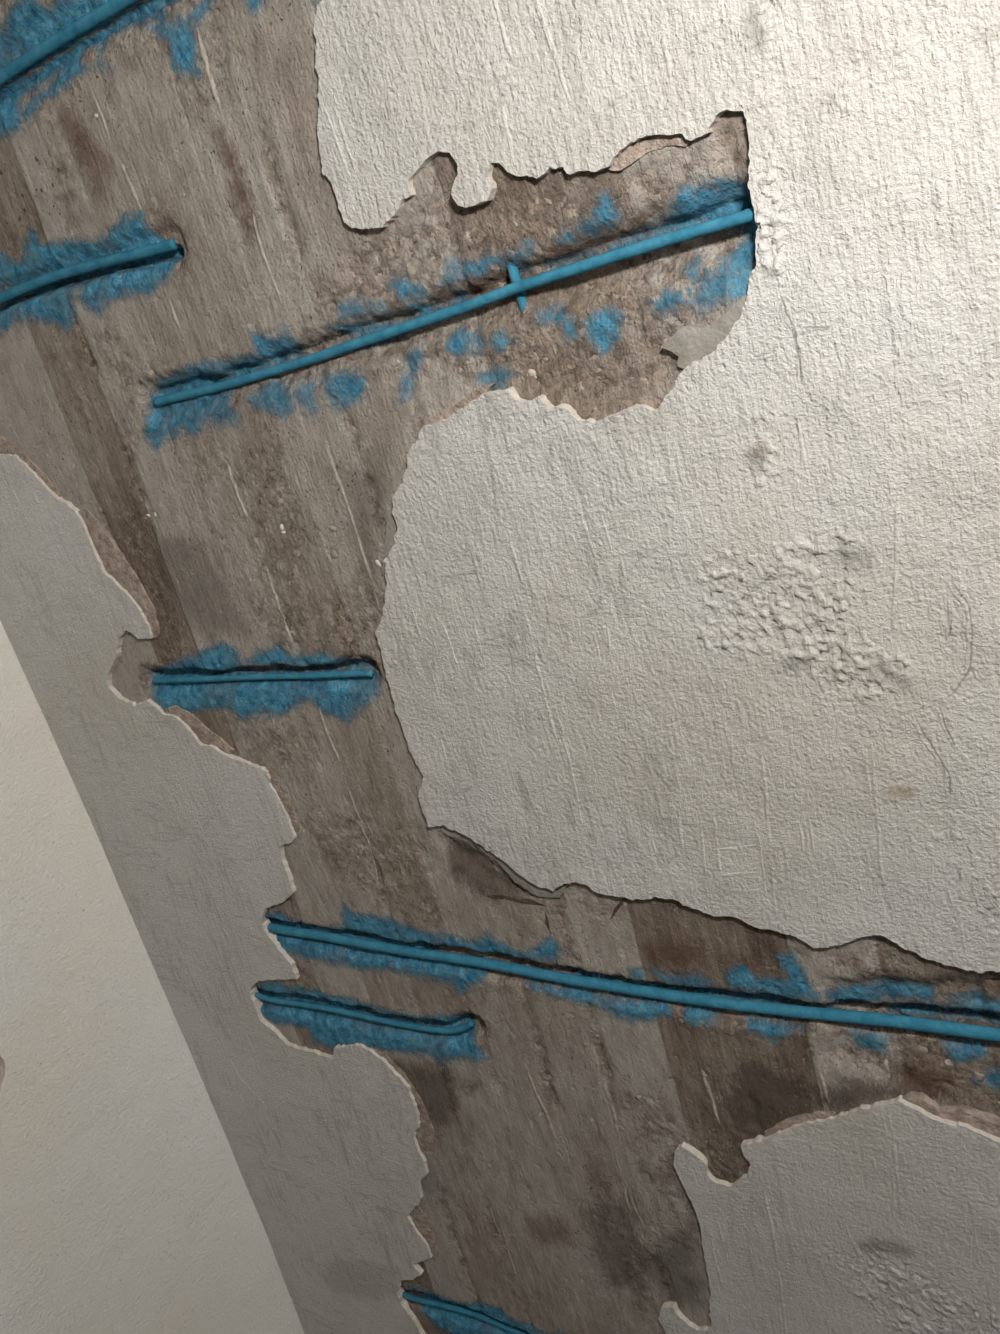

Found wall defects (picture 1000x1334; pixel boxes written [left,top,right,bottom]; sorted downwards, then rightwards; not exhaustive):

spalling [0,0,1000,1042]
spalling [255,938,1000,1334]